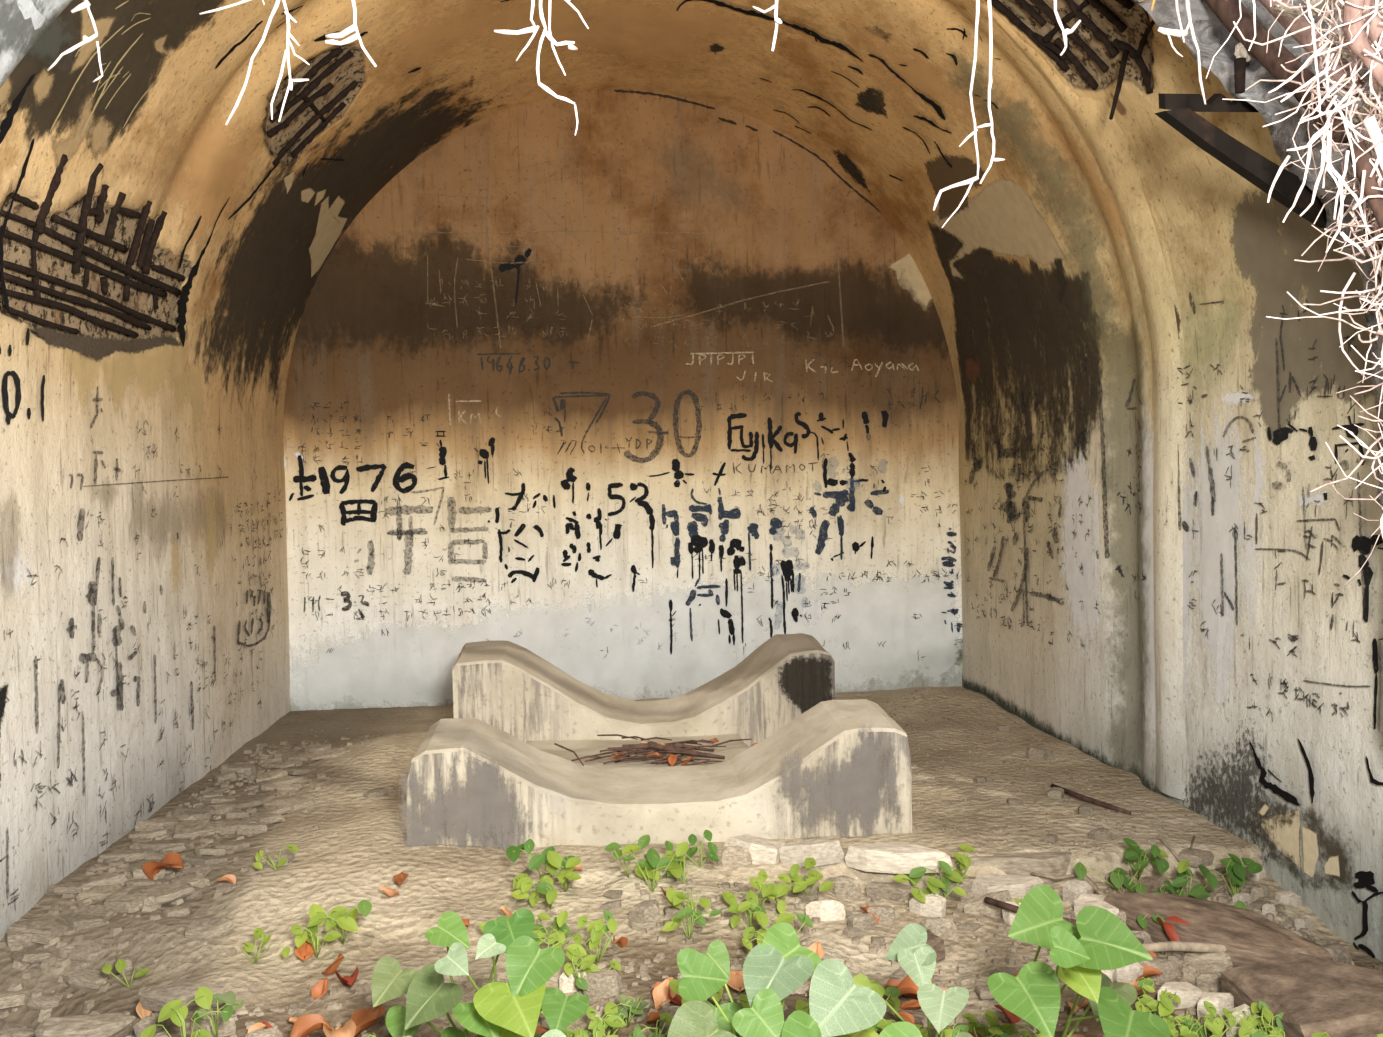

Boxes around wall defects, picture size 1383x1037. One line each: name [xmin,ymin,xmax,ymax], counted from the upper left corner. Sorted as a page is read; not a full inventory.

spalling [991,0,1155,120]
spalling [0,94,192,362]
spalling [265,45,365,277]
peeling [925,155,1065,278]
water stain [1054,259,1092,320]
crack [1249,739,1315,869]
spalling [1259,804,1340,877]
crack [1366,756,1383,785]
crack [1351,871,1383,958]